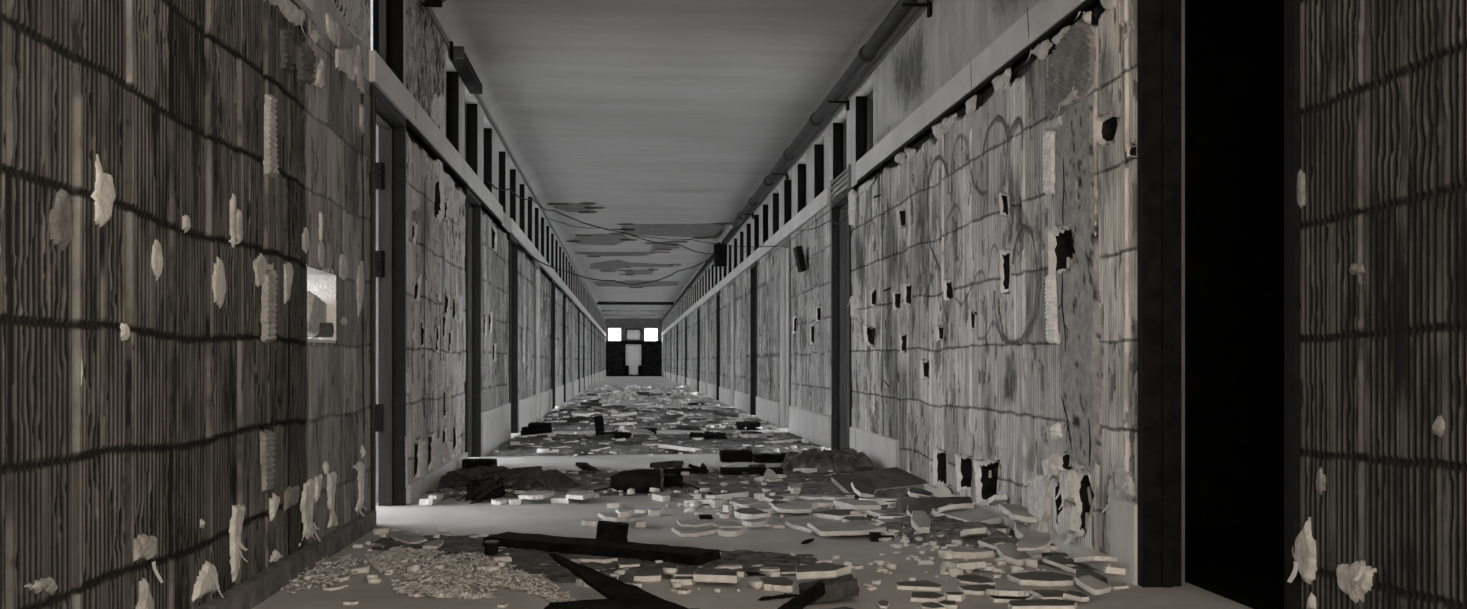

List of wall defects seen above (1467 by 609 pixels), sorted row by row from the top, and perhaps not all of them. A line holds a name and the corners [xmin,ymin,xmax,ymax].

spalling [1042,86,1075,195]
spalling [1095,114,1137,158]
spalling [413,273,457,353]
peeling [566,223,732,288]
spalling [863,324,878,348]
spalling [870,282,913,311]
spalling [899,331,930,380]
spalling [999,249,1011,293]
spalling [1044,224,1077,345]
spalling [407,390,458,491]
spalling [1047,423,1108,545]
peeling [1287,561,1299,583]